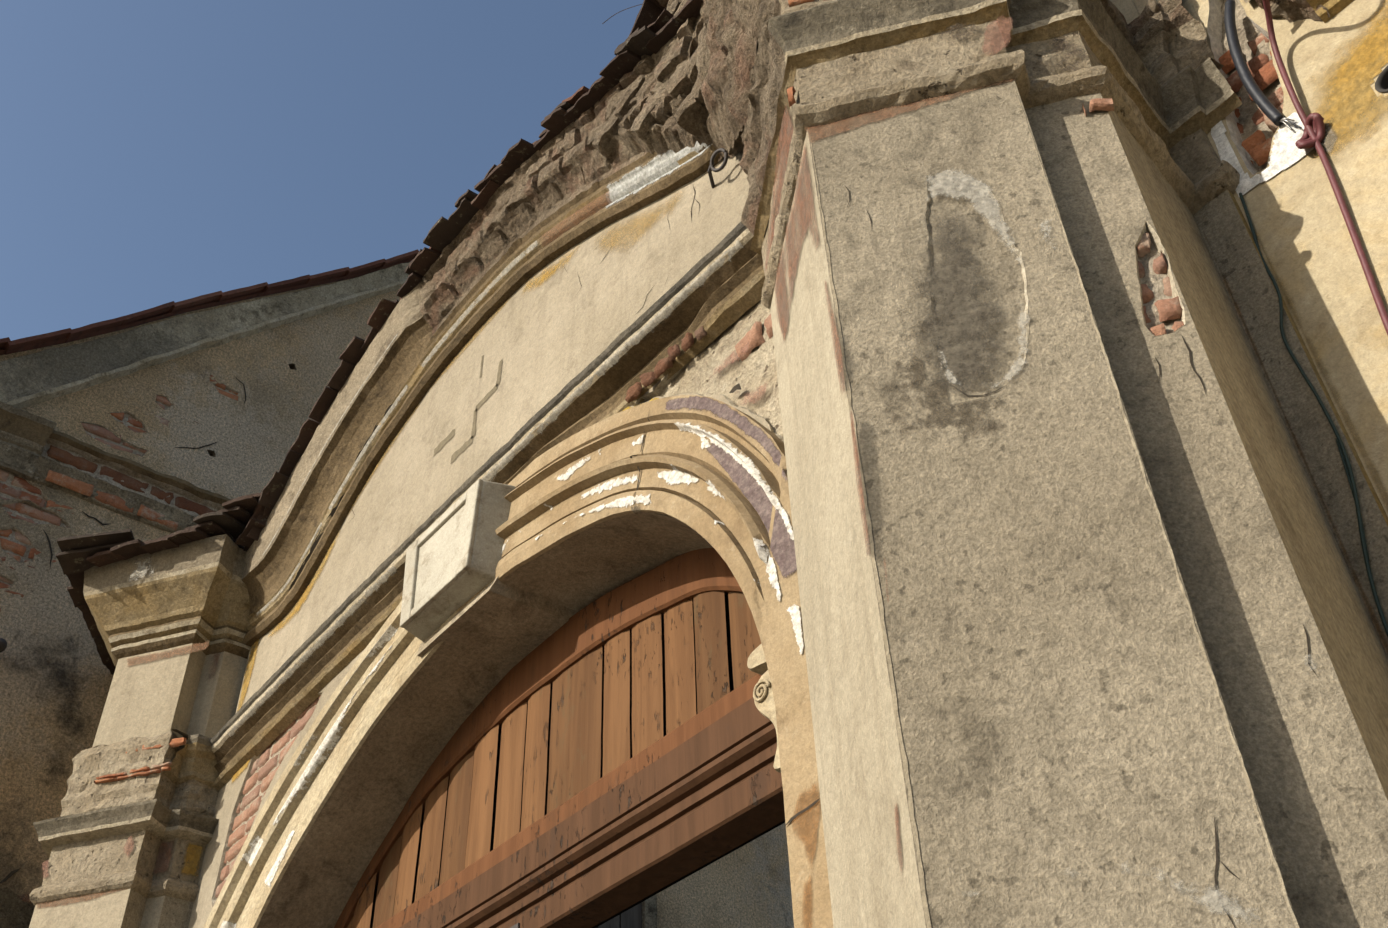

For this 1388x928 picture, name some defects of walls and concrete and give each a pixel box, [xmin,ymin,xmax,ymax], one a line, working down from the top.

flaking render [1207,0,1315,197]
flaking render [0,445,216,597]
flaking render [80,394,174,457]
peeling [501,475,651,553]
peeling [482,240,743,481]
peeling [657,464,726,502]
flaking render [623,300,784,441]
peeling [675,422,794,540]
damp [918,211,1005,394]
flaking render [1135,221,1185,336]
peeling [753,538,804,655]
flaking render [212,625,398,907]